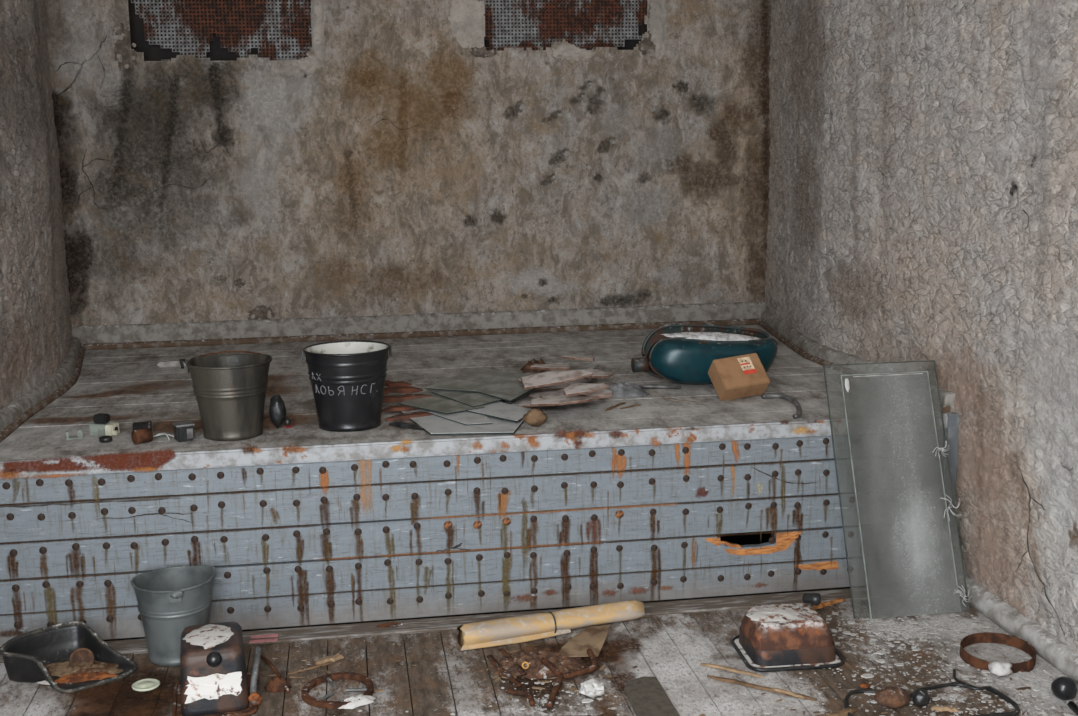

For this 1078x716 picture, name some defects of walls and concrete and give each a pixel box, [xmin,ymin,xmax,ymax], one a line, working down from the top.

damp [53,95,76,211]
damp [64,61,235,315]
damp [668,0,770,232]
rust [0,449,175,636]
rust [179,506,309,622]
rust [316,459,397,621]
rust [376,487,621,628]
rust [555,430,592,447]
rust [619,486,670,600]
rust [593,431,827,582]
spalling [705,531,802,556]
damp [73,667,180,716]